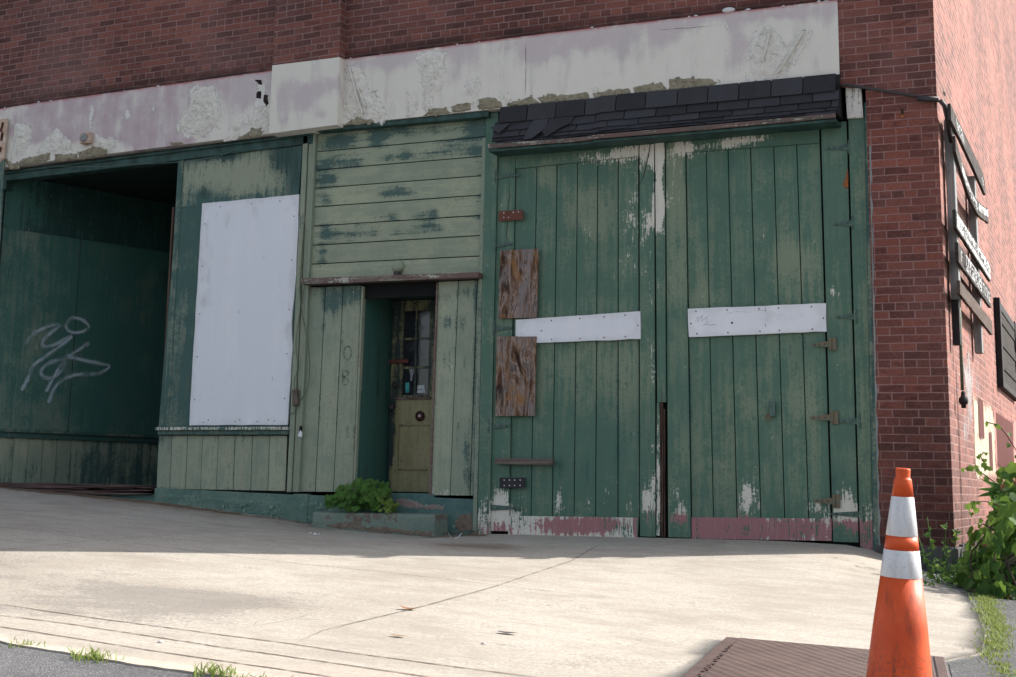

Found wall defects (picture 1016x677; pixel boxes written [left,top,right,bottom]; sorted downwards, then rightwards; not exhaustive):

spalling [745,25,813,82]
spalling [170,84,264,146]
spalling [5,122,116,170]